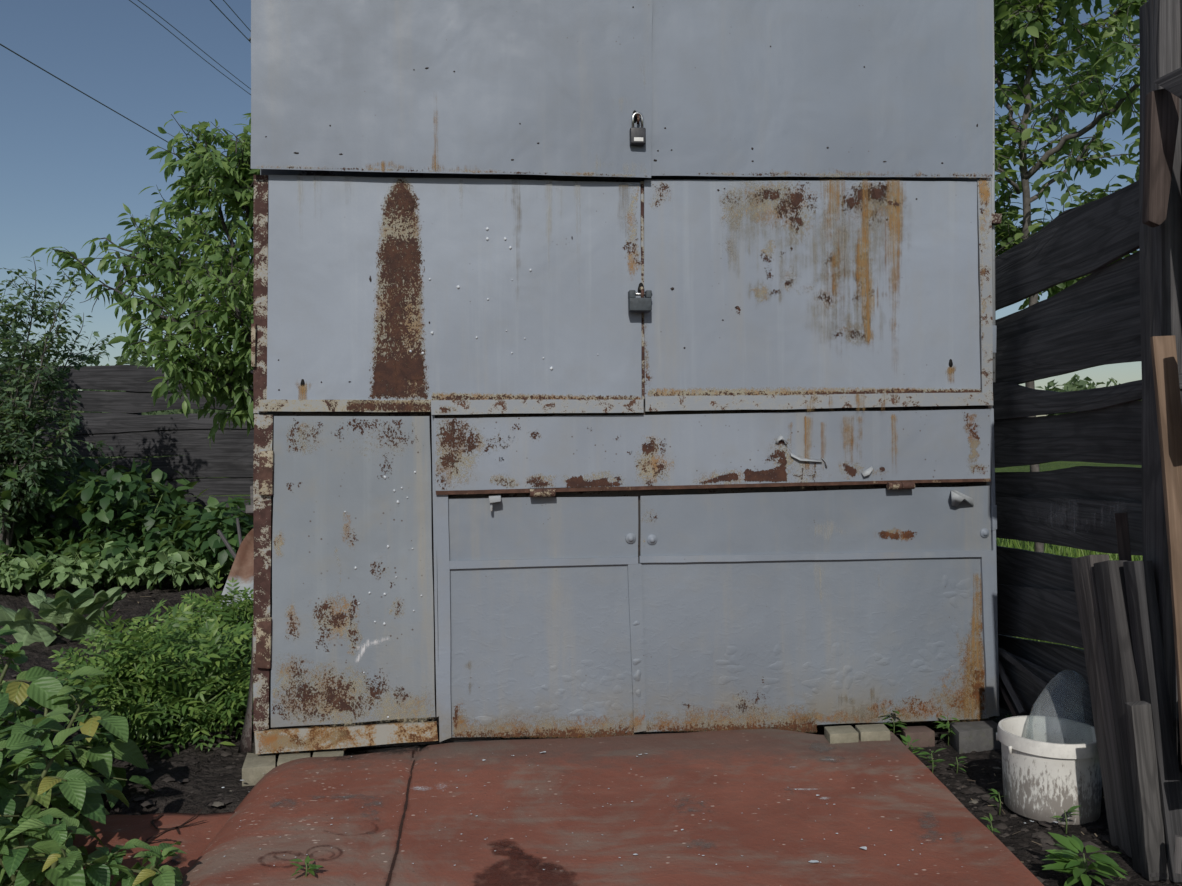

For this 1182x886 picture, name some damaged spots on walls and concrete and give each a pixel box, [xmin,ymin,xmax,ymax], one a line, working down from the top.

rust [286,156,992,490]
rust [878,529,917,540]
rust [259,596,429,753]
rust [453,579,985,739]